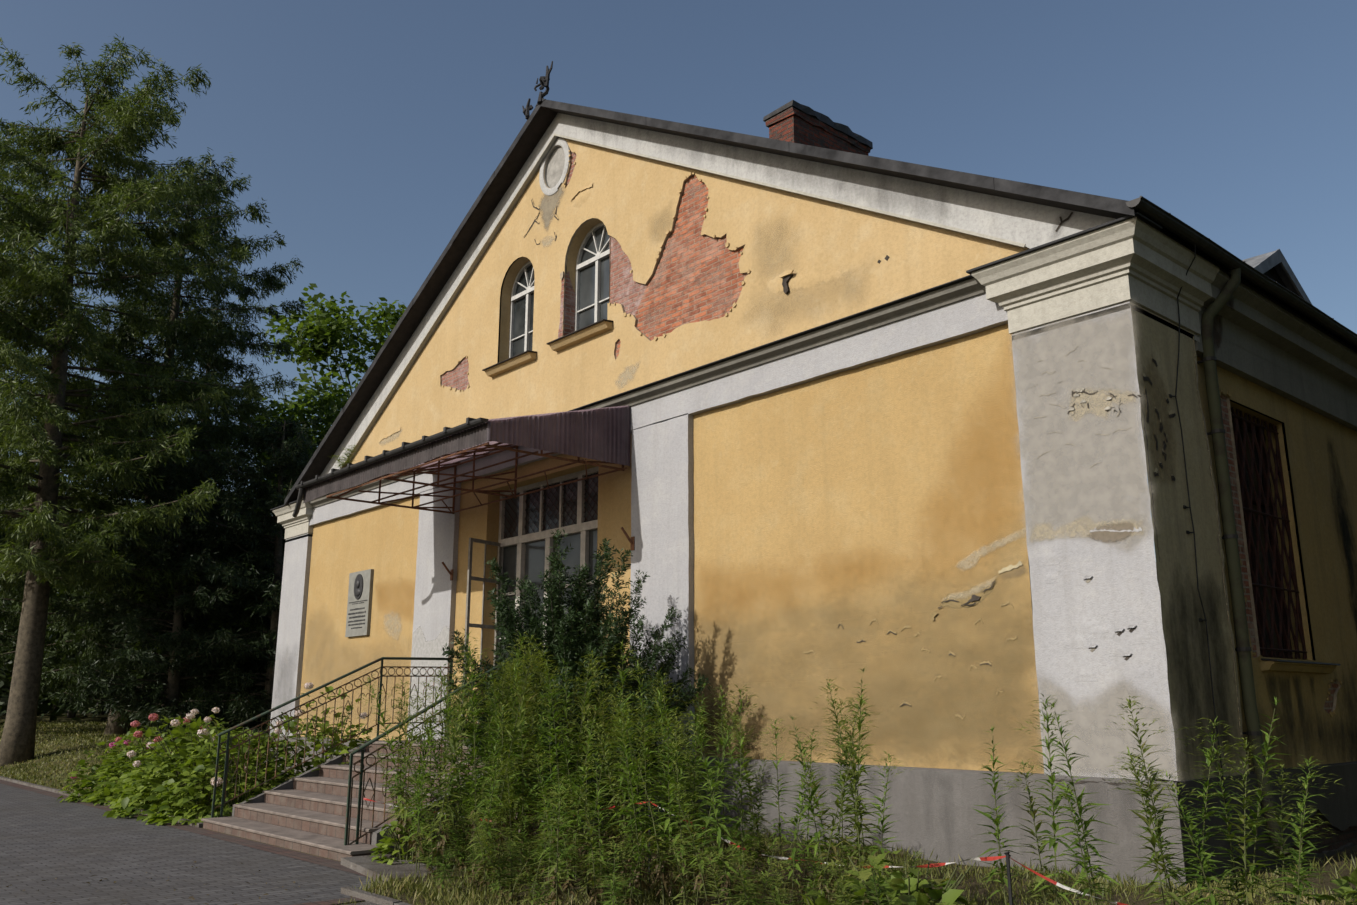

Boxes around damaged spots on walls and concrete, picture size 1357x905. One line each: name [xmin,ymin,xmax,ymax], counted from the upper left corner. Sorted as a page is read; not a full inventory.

spalling [534,150,598,338]
spalling [609,172,752,341]
spalling [440,356,470,391]
peeling [614,339,635,386]
water stain [1330,445,1354,586]
peeling [958,519,1142,568]
spalling [1291,809,1357,854]